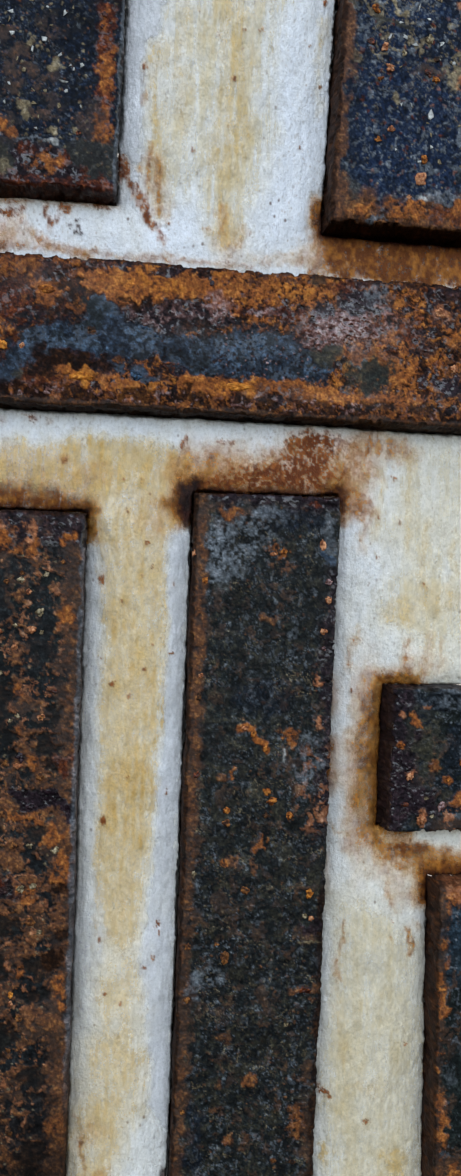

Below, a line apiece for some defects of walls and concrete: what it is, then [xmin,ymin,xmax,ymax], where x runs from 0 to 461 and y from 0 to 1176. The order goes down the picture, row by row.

corrosion [0,0,461,457]
corrosion [0,435,125,1176]
corrosion [160,428,372,1176]
corrosion [350,655,461,1176]